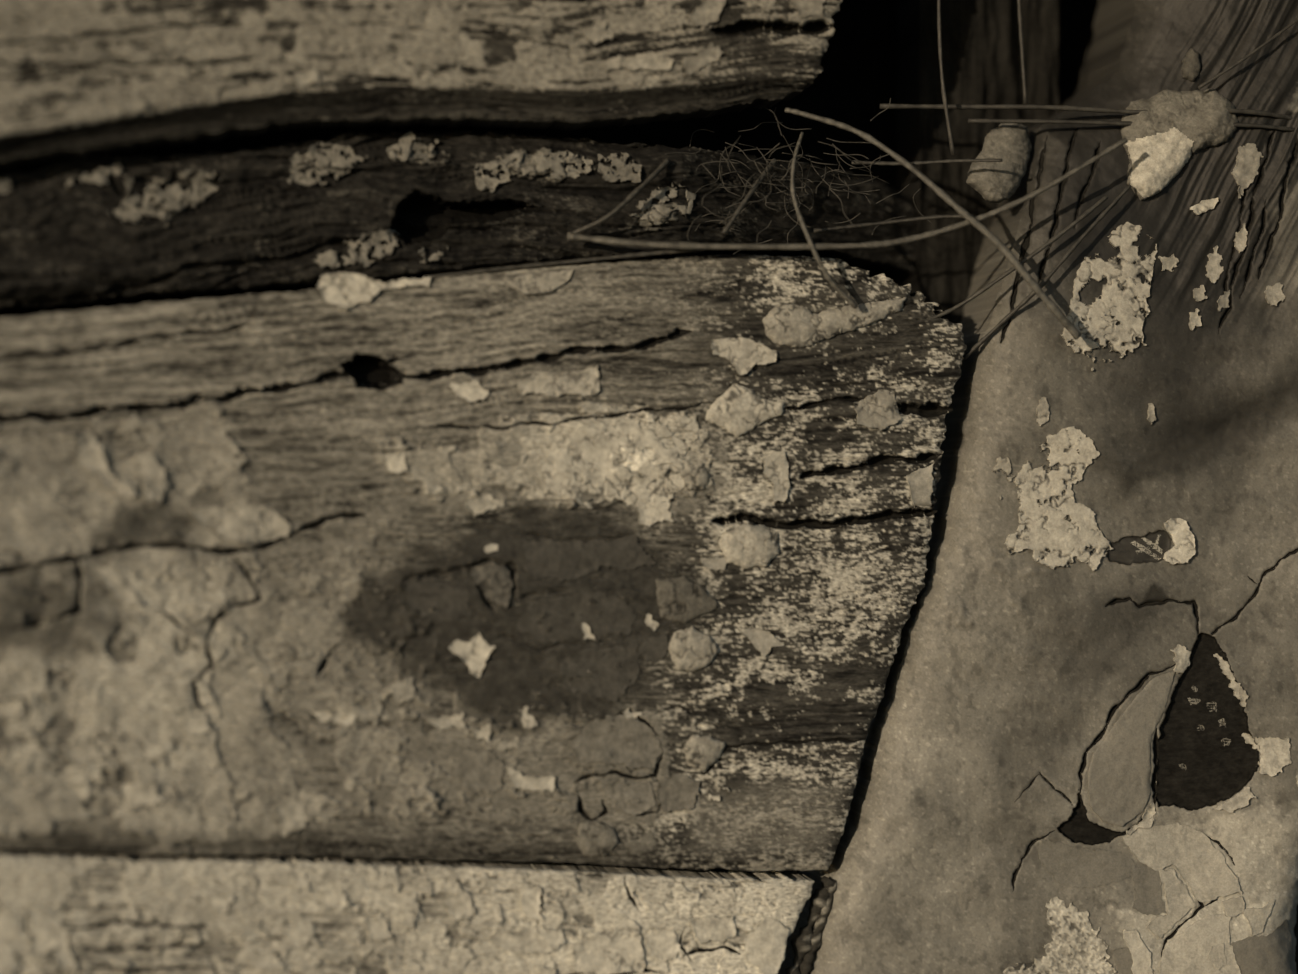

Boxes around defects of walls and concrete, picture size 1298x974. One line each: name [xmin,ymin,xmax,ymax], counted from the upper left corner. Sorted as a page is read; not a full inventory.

crack [711,20,833,37]
crack [0,324,692,423]
peeling [310,229,449,310]
peeling [473,150,696,226]
peeling [1061,222,1179,371]
peeling [993,397,1196,571]
crack [0,513,366,713]
leakage [348,504,696,730]
peeling [404,414,730,816]
crack [1105,548,1298,637]
crack [1012,664,1176,890]
spalling [1003,633,1298,974]